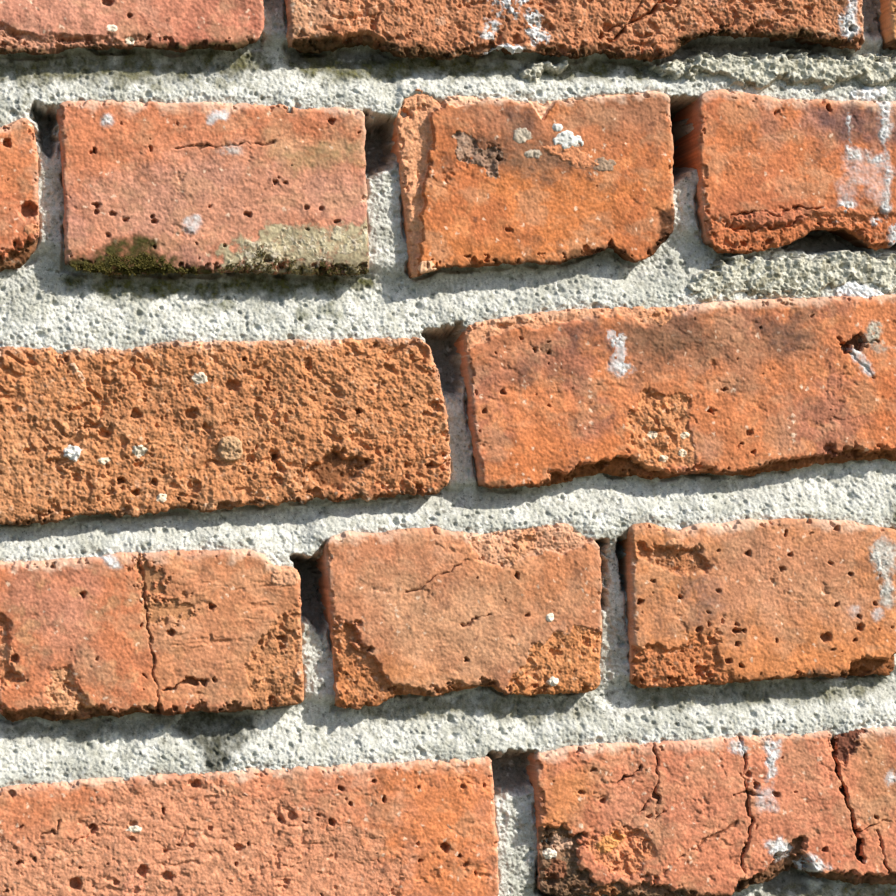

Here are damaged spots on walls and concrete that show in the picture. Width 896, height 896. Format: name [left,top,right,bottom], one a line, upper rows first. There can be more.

damp [481,0,550,55]
damp [838,0,860,39]
damp [846,146,891,225]
damp [69,236,212,275]
crack [405,562,463,593]
crack [127,553,207,711]
crack [617,743,664,827]
crack [663,736,759,874]
crack [829,728,890,874]
spalling [538,821,685,896]
damp [765,837,792,859]
damp [797,854,832,872]